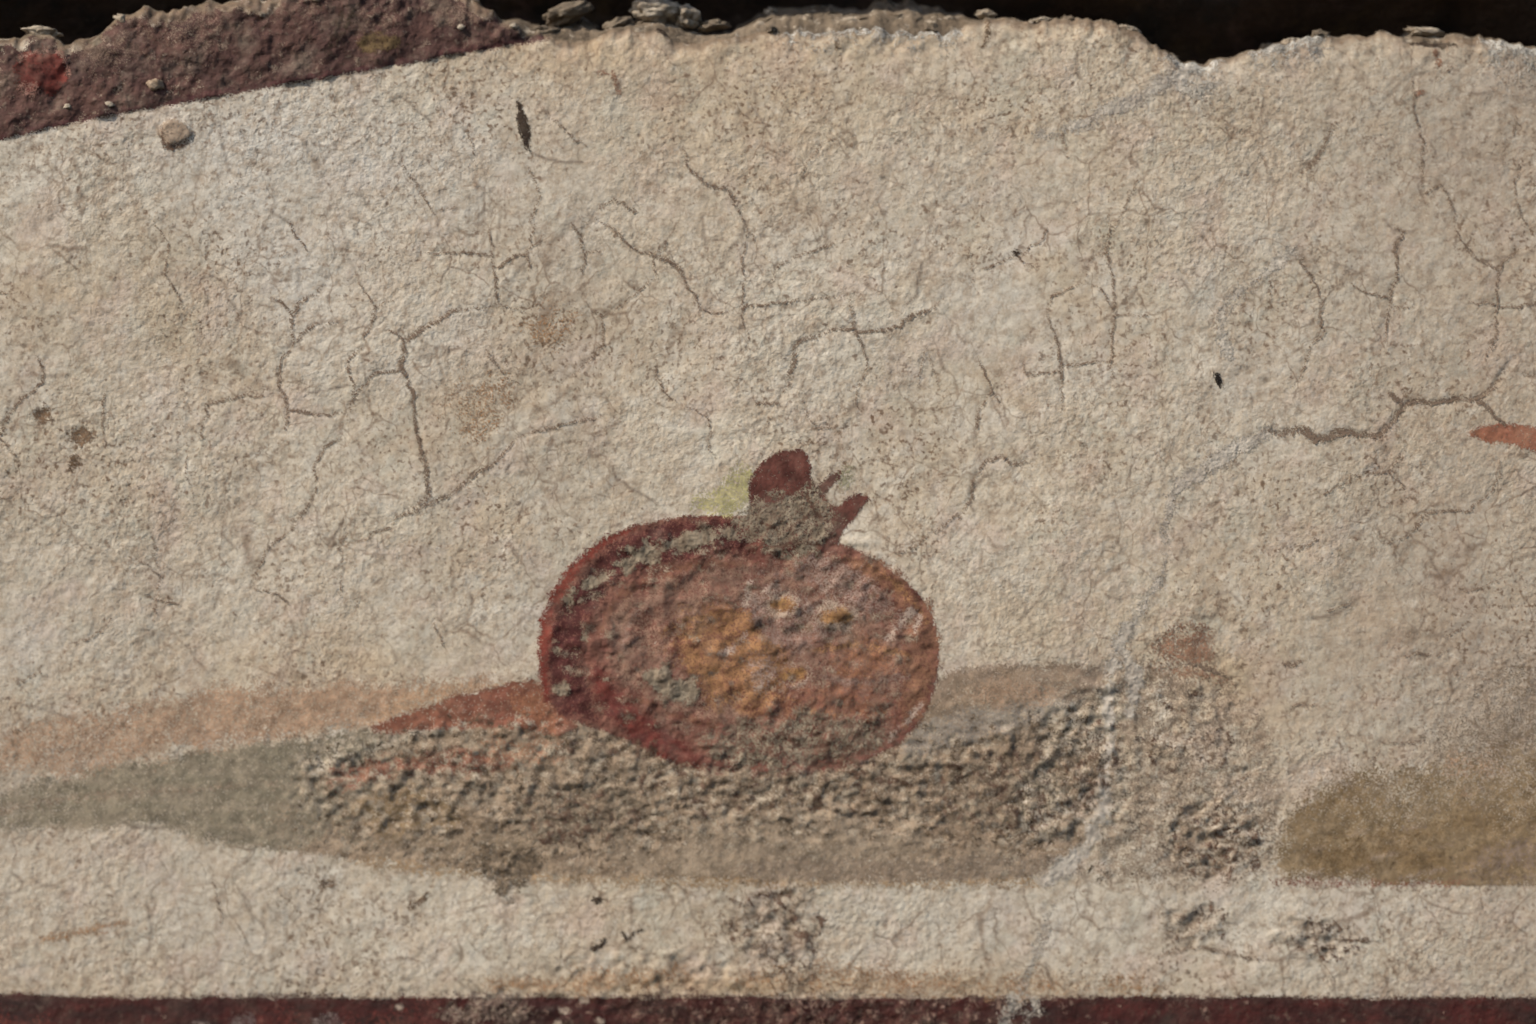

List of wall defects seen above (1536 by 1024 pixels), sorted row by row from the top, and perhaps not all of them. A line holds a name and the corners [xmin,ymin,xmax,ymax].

spalling [0,5,156,98]
spalling [470,0,1300,67]
spalling [1330,27,1536,49]
spalling [515,100,531,153]
crack [552,118,586,147]
crack [0,356,45,458]
crack [101,148,1148,620]
crack [996,63,1536,1024]
crack [211,880,246,962]
crack [738,899,788,952]